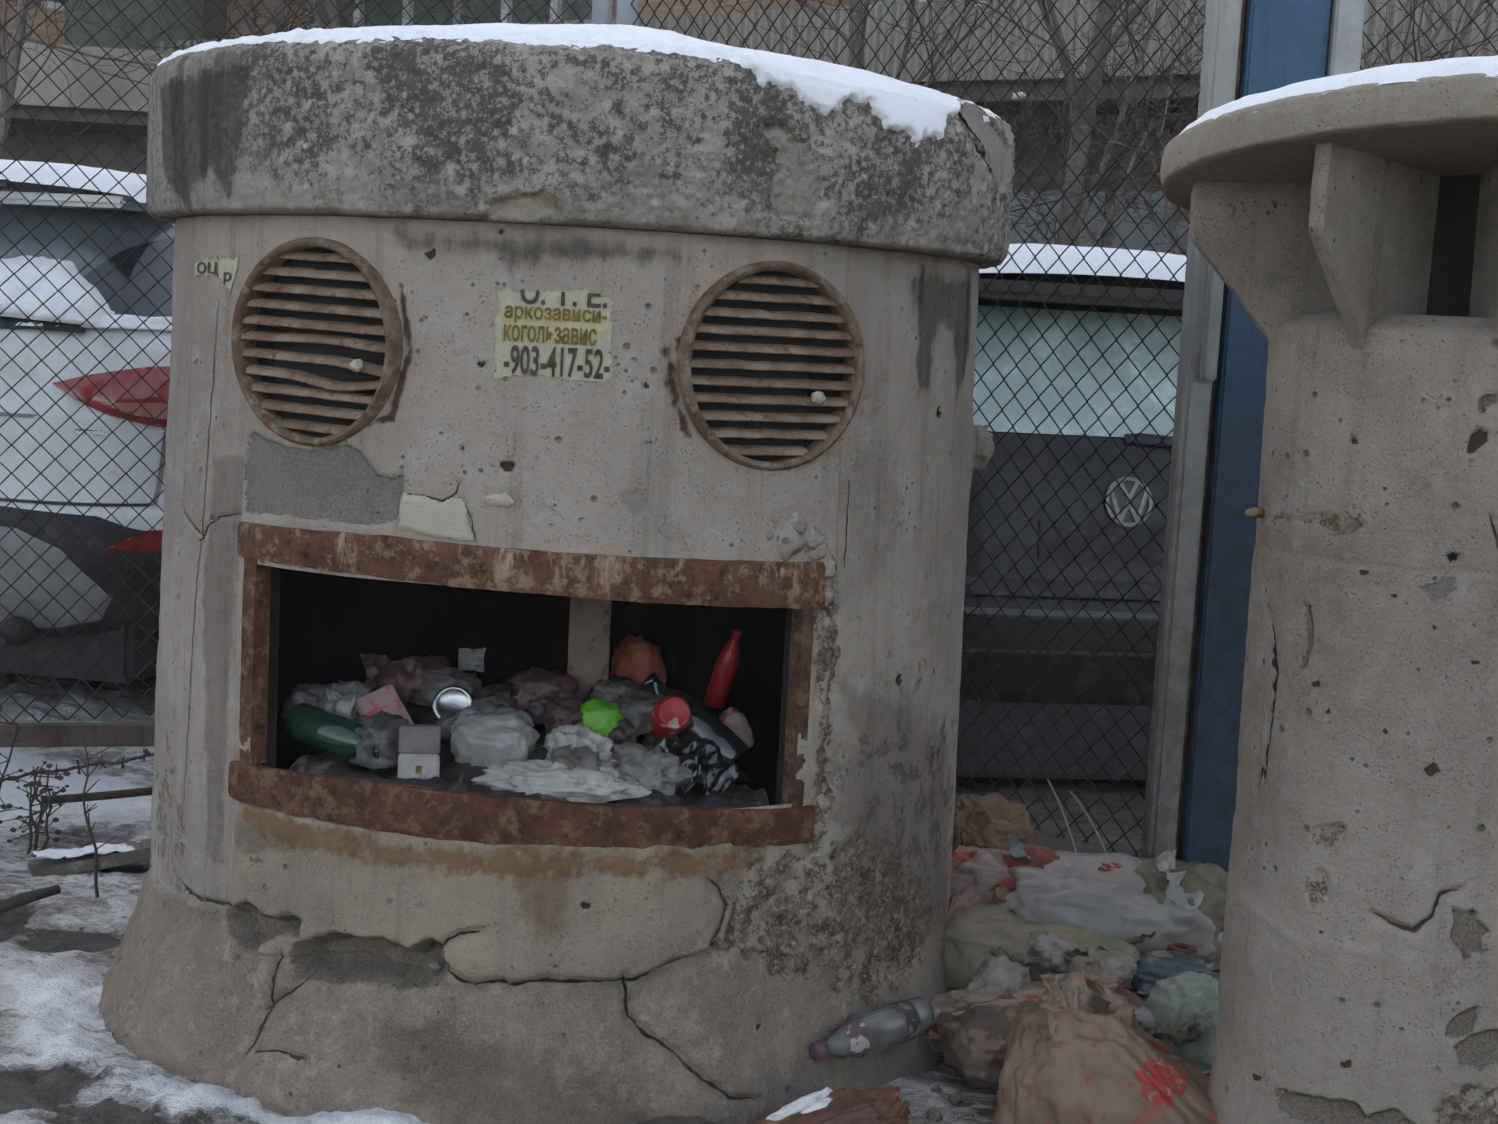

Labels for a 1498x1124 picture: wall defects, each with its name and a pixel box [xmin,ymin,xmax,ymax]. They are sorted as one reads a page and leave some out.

spalling [958,99,1012,195]
crack [1259,625,1279,786]
rust [243,804,760,877]
spalling [705,583,931,1008]
crack [245,949,308,1060]
spalling [225,902,449,990]
crack [442,877,756,1101]
spalling [1450,909,1490,959]
spalling [1274,1088,1415,1124]
spalling [1435,1006,1498,1124]